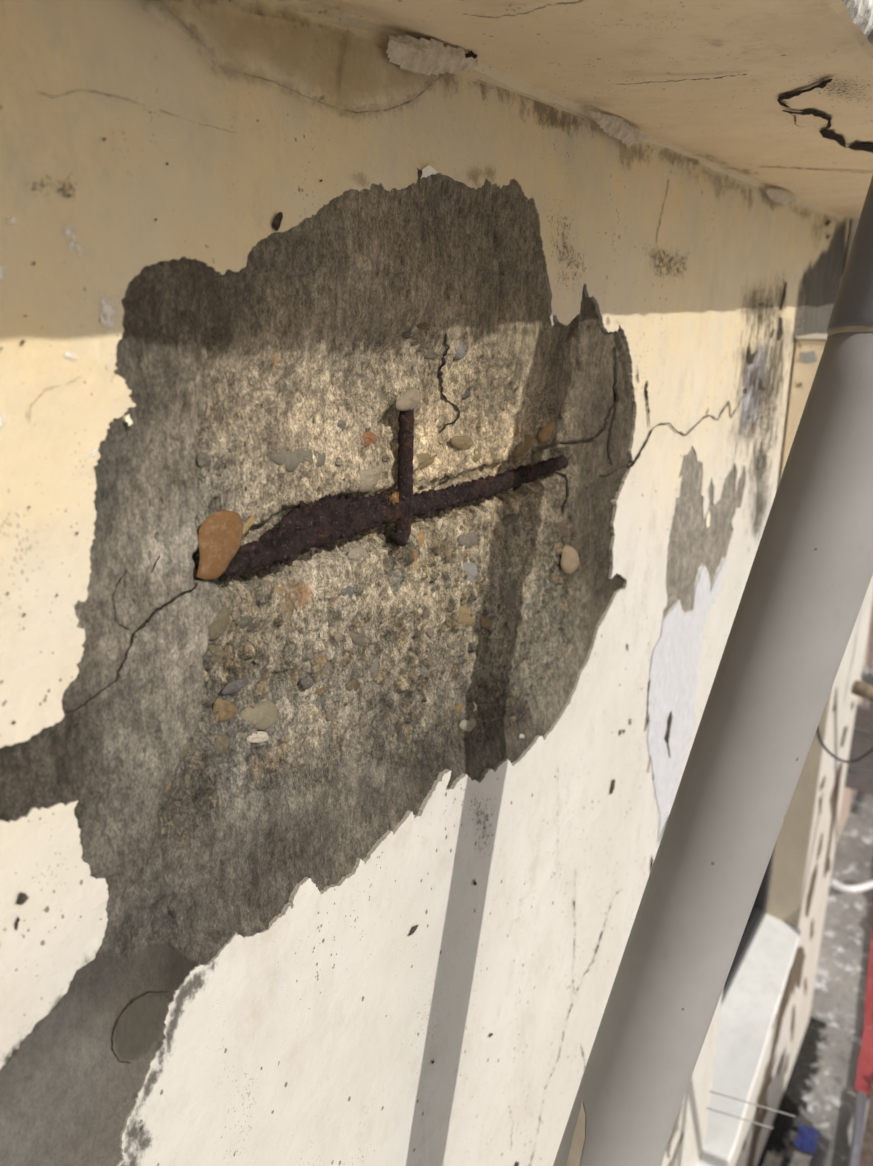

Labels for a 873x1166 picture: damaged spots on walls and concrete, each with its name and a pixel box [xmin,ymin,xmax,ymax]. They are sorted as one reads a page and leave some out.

crack [762,78,873,173]
crack [438,334,460,449]
crack [559,346,737,467]
corrosion [220,409,569,579]
crack [556,472,569,512]
crack [66,555,198,713]
spalling [0,165,634,1166]
peeling [619,447,744,844]